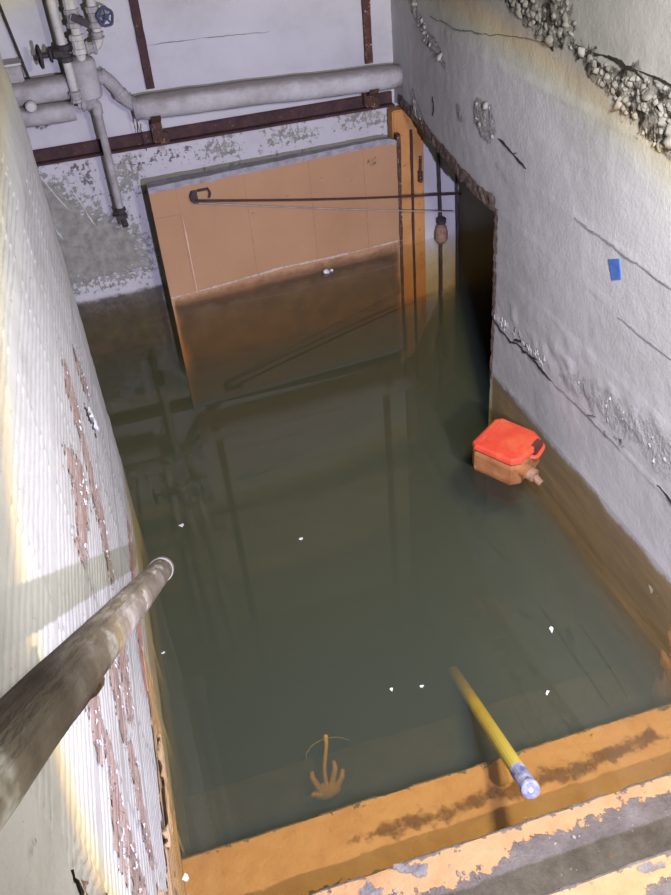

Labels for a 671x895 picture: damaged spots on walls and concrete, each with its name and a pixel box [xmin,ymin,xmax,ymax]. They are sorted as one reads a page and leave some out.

crack [430,16,540,43]
flaking render [509,0,671,153]
crack [575,44,671,87]
peeling [54,161,102,201]
crack [574,217,671,289]
crack [617,317,671,359]
rust [136,622,149,696]
flaking render [85,643,189,895]
peeling [536,729,659,785]
peeling [375,782,523,838]
peeling [358,881,383,895]
peeling [393,862,428,878]